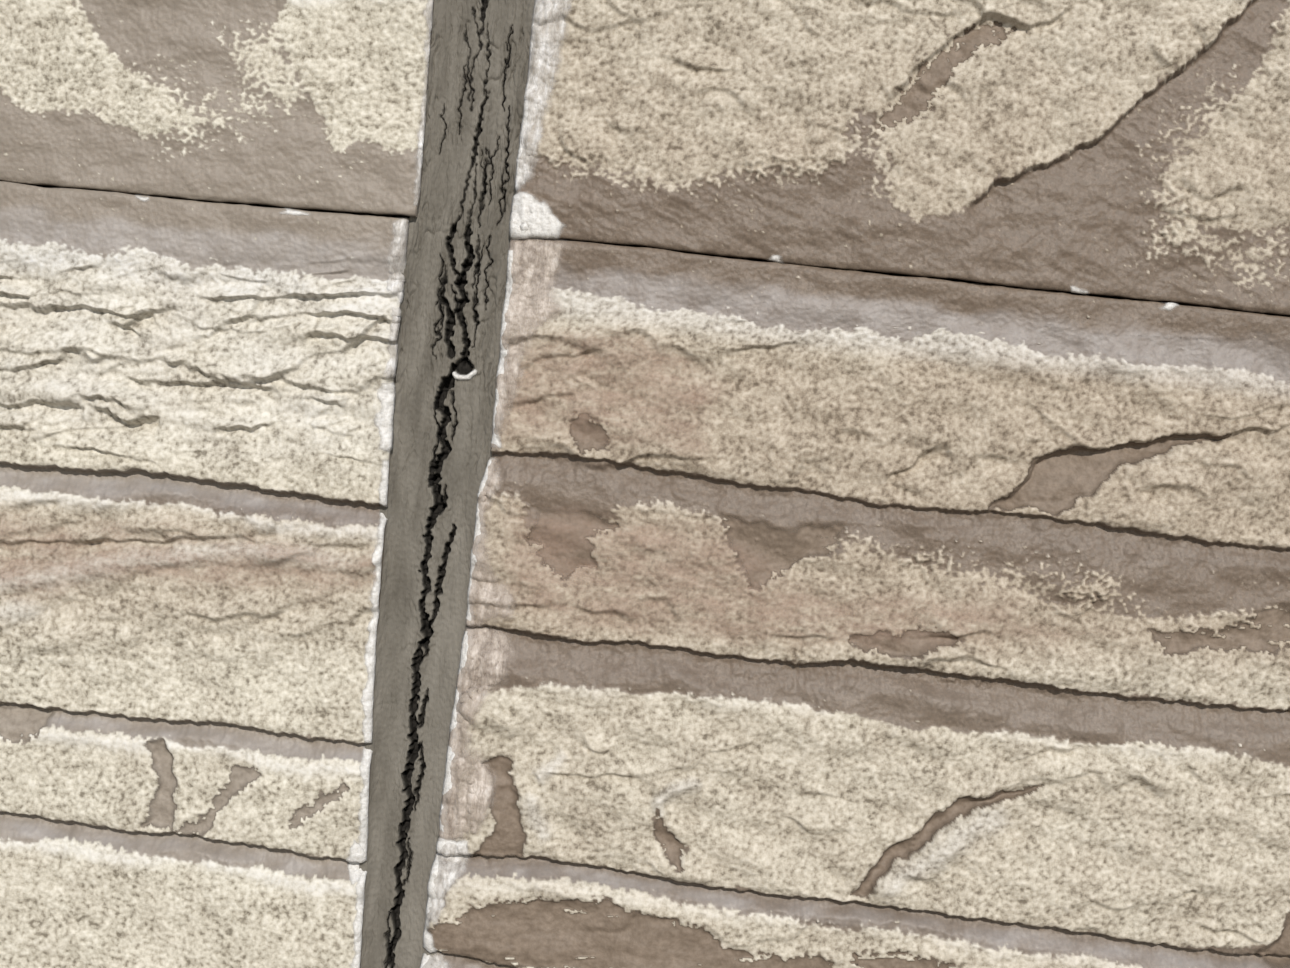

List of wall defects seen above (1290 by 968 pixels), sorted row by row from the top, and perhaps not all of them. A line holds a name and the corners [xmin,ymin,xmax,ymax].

crack [385,0,513,968]